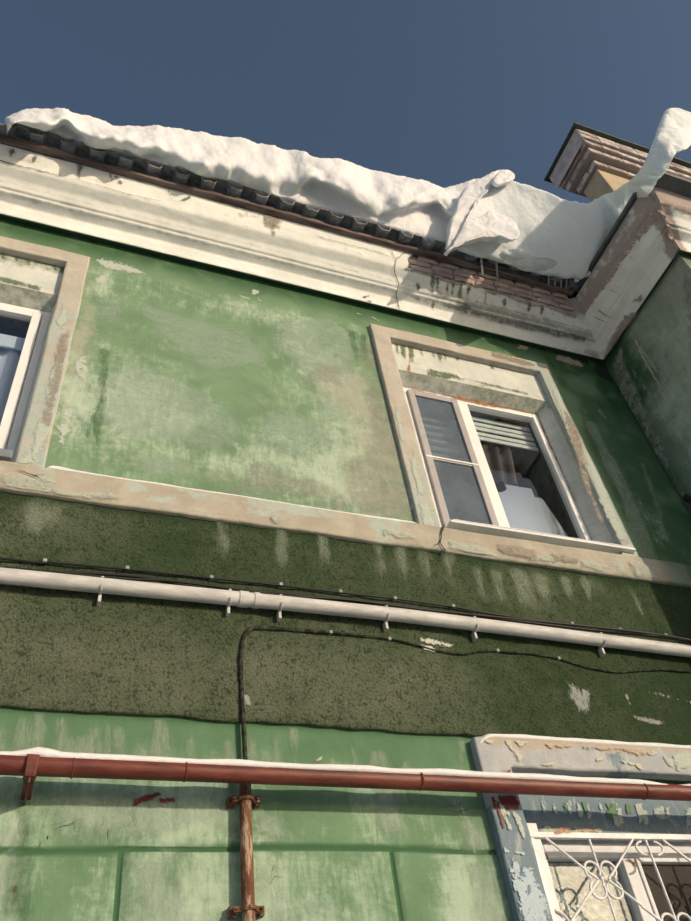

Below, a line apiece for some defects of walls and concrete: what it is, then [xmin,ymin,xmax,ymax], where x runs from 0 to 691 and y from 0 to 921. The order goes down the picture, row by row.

peeling [95,258,149,285]
crack [318,236,404,307]
spalling [405,256,576,318]
peeling [546,742,691,771]
peeling [538,800,671,833]
peeling [504,847,550,921]